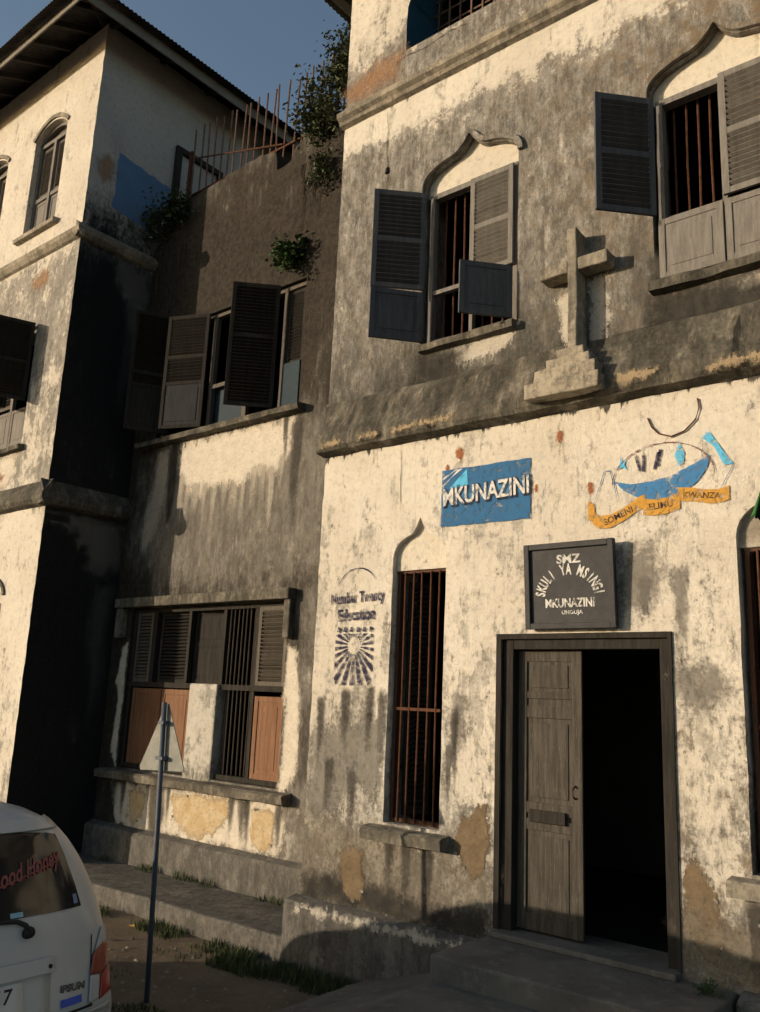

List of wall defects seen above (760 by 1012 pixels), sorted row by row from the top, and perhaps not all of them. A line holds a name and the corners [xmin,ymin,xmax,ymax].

water stain [142,444,178,553]
water stain [284,416,302,495]
flaking render [110,643,129,766]
flaking render [278,647,301,792]
water stain [304,687,388,817]
water stain [443,693,467,790]
flaking render [112,780,285,857]
spalling [338,845,365,903]
flaking render [294,904,463,948]
water stain [302,843,488,938]
spalling [450,803,491,882]